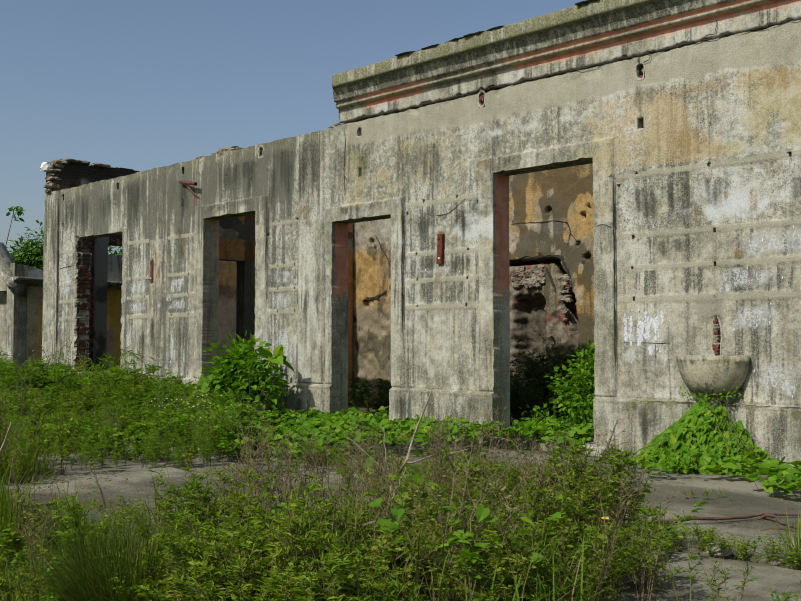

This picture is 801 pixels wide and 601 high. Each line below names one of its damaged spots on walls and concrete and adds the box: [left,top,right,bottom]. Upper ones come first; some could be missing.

spalling [43,158,111,193]
spalling [511,265,546,288]
spalling [560,274,573,322]
peeling [733,303,771,330]
spalling [709,315,722,356]